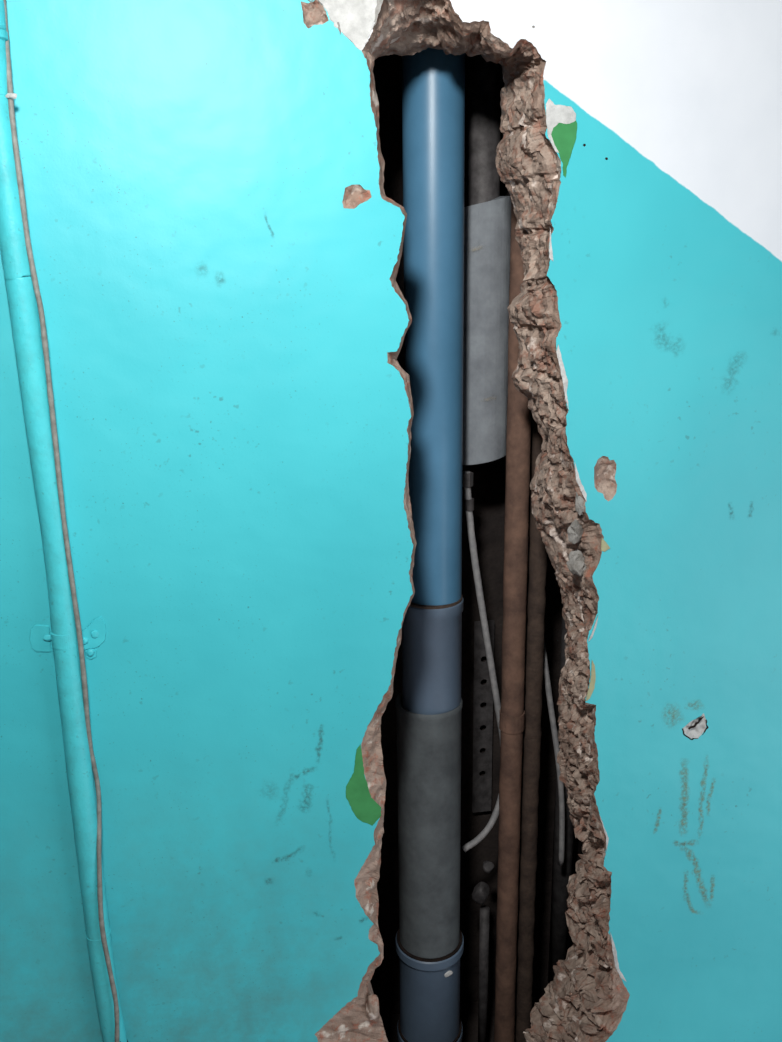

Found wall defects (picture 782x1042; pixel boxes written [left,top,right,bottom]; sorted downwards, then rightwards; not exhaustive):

spalling [301,0,630,1042]
spalling [682,713,709,740]